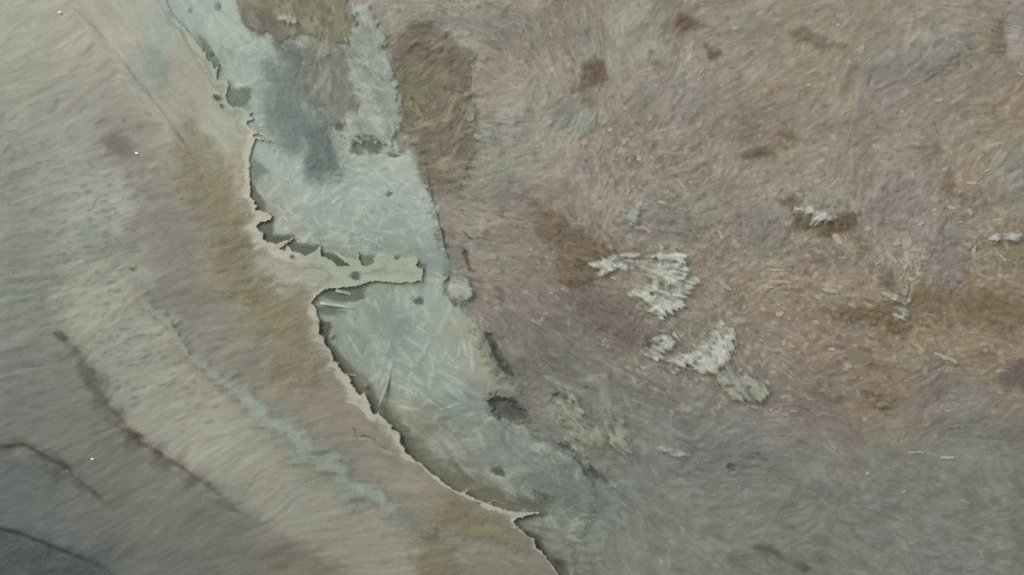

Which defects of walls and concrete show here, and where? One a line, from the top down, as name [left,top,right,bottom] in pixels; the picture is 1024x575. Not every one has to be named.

flaking render [0,0,597,575]